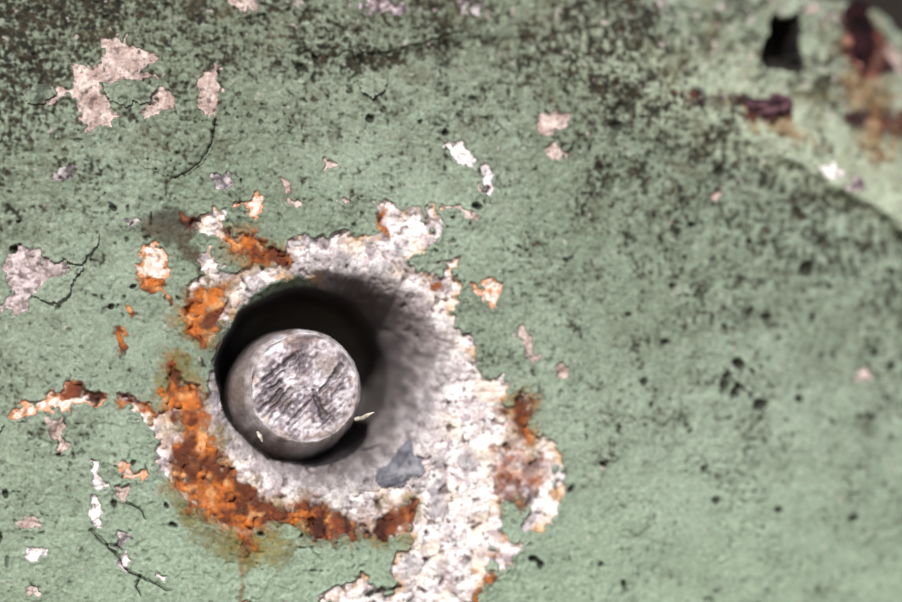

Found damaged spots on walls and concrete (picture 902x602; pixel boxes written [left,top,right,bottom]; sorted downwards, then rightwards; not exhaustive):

peeling [228,0,257,16]
peeling [22,34,175,133]
peeling [536,110,571,160]
peeling [442,140,494,195]
corrosion [224,229,292,270]
corrosion [140,277,173,305]
corrosion [181,280,231,348]
corrosion [51,380,107,406]
spalling [0,191,566,602]
corrosion [498,392,537,446]
corrosion [118,355,420,573]
crack [91,531,166,595]